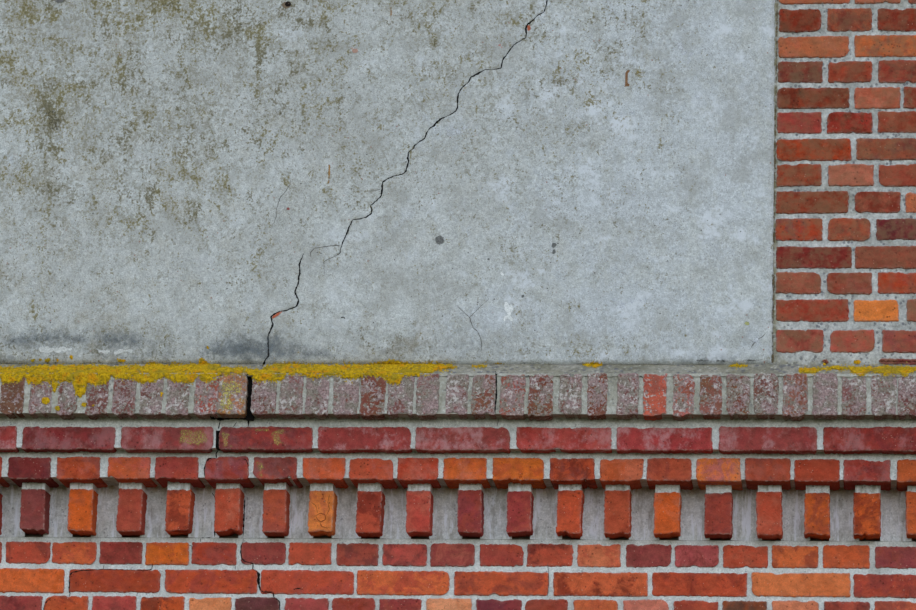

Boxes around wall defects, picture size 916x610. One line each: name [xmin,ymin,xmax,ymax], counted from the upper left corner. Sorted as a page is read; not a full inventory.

crack [204,0,547,497]